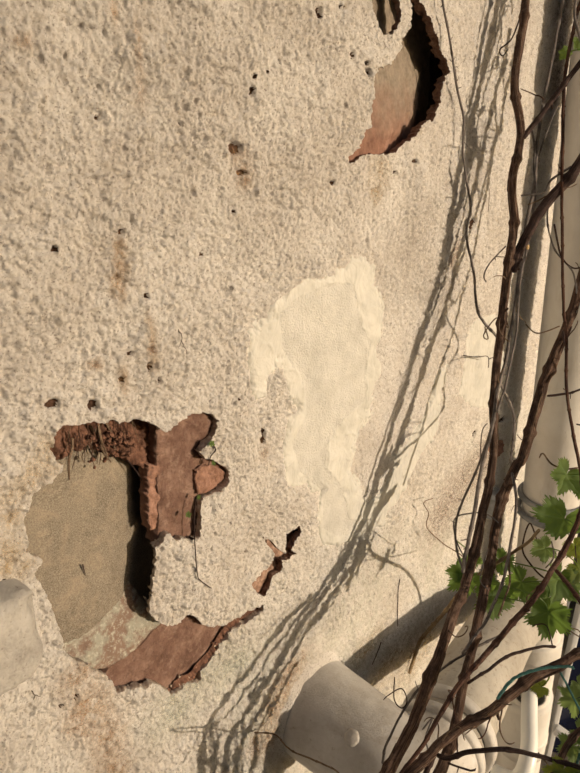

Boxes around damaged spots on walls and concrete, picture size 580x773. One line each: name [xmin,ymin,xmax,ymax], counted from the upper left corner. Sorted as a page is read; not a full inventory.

spalling [348,0,450,164]
spalling [24,412,264,695]
crack [252,526,302,596]